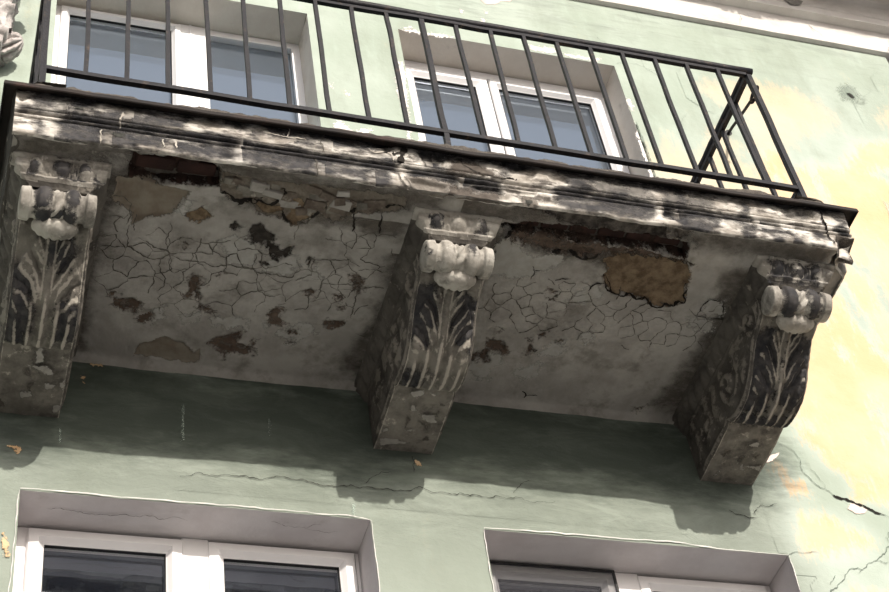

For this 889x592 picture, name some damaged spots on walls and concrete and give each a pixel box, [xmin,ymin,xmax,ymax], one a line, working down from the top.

flaking render [18,99,236,255]
spalling [294,61,500,204]
crack [460,161,517,180]
peeling [44,237,77,275]
spalling [182,273,217,313]
crack [94,146,438,337]
crack [478,249,731,354]
peeling [20,348,65,398]
crack [186,456,550,503]
crack [778,442,889,592]